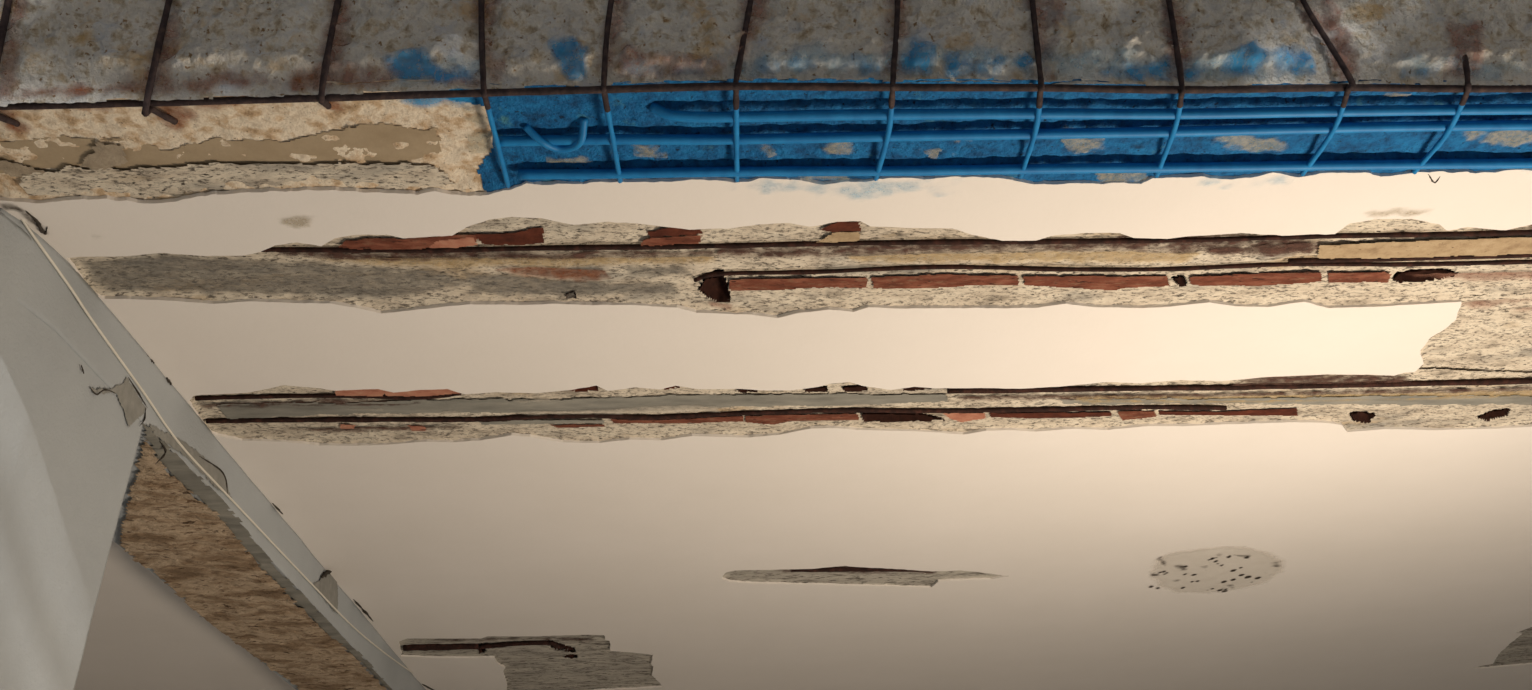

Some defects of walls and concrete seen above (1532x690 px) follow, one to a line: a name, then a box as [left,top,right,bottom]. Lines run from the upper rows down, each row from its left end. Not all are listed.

spalling [0,0,1532,200]
spalling [70,217,1532,444]
spalling [81,365,392,690]
spalling [399,635,661,690]
spalling [722,566,1001,586]
spalling [1479,627,1532,667]